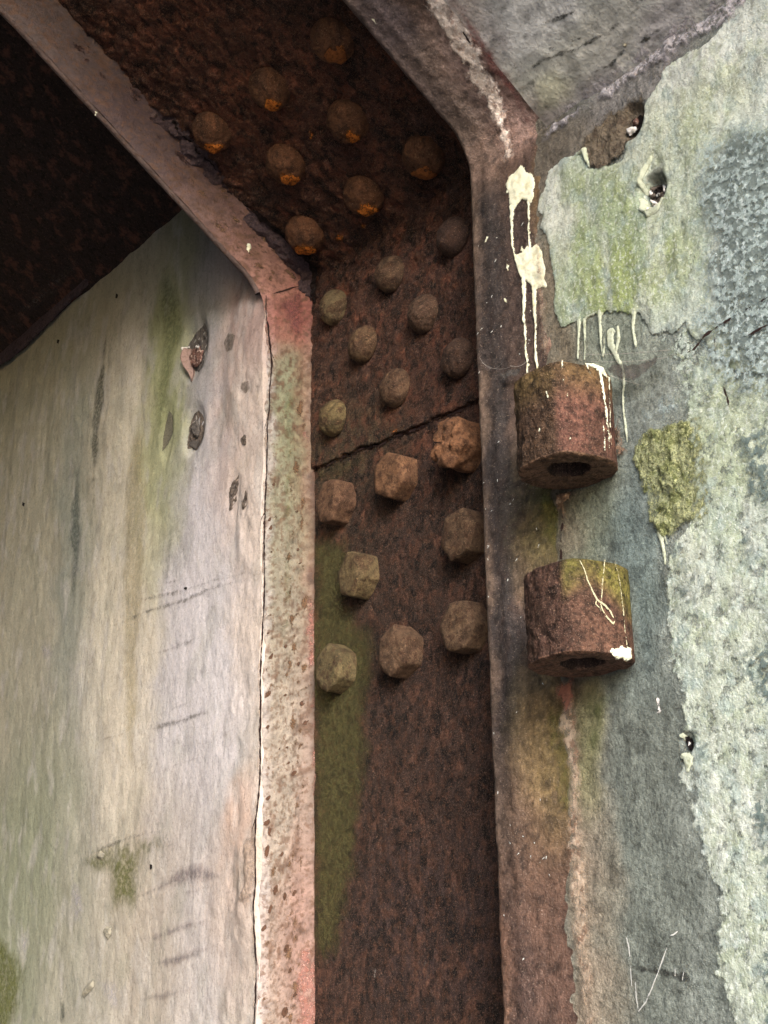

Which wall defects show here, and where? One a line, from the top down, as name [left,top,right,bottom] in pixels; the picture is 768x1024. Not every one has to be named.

rust [150,108,232,199]
rust [216,208,318,331]
rust [265,99,282,112]
rust [281,173,300,185]
rust [357,203,379,227]
crack [314,389,478,471]
peeling [537,0,768,1024]
rust [266,578,309,750]
rust [261,819,302,945]
rust [281,914,300,1024]